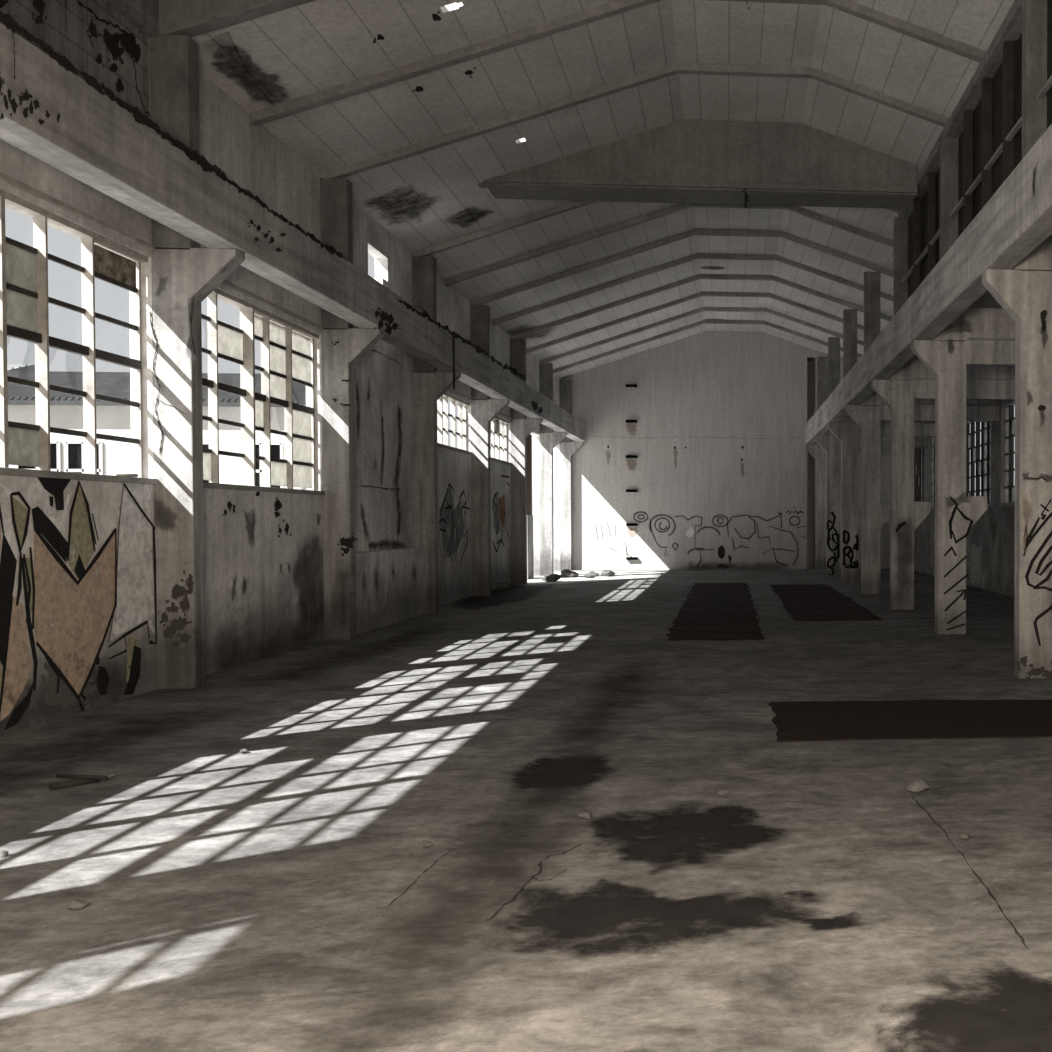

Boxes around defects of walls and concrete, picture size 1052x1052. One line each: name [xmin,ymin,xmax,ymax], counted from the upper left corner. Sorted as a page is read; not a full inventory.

water stain [213,45,287,104]
spalling [0,0,345,260]
water stain [368,189,433,223]
water stain [452,208,492,227]
spalling [158,570,199,646]
crack [910,793,1027,947]